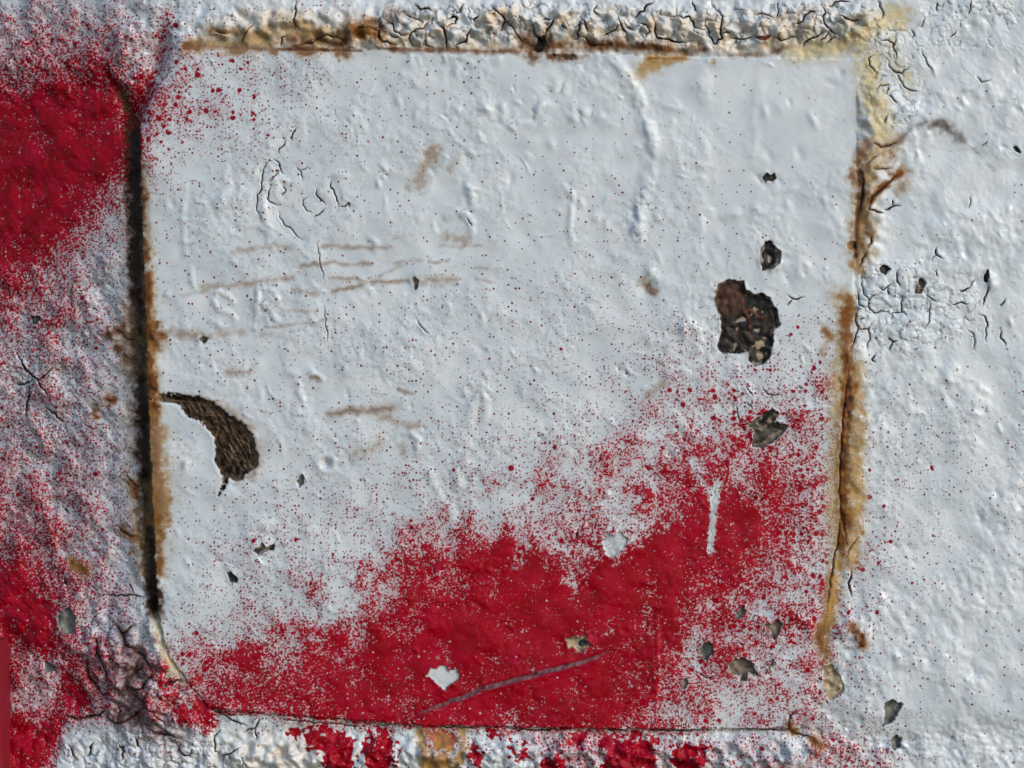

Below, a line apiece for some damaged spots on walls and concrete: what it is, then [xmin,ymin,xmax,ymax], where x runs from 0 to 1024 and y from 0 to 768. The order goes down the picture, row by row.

rust [183,18,715,74]
rust [104,91,173,619]
crack [256,129,349,280]
crack [280,0,1006,604]
spalling [710,275,786,369]
peeling [757,238,784,273]
rust [848,137,910,273]
spalling [154,392,259,496]
peeling [743,406,790,451]
rust [821,295,858,549]
rust [849,624,867,649]
peeling [880,697,905,754]